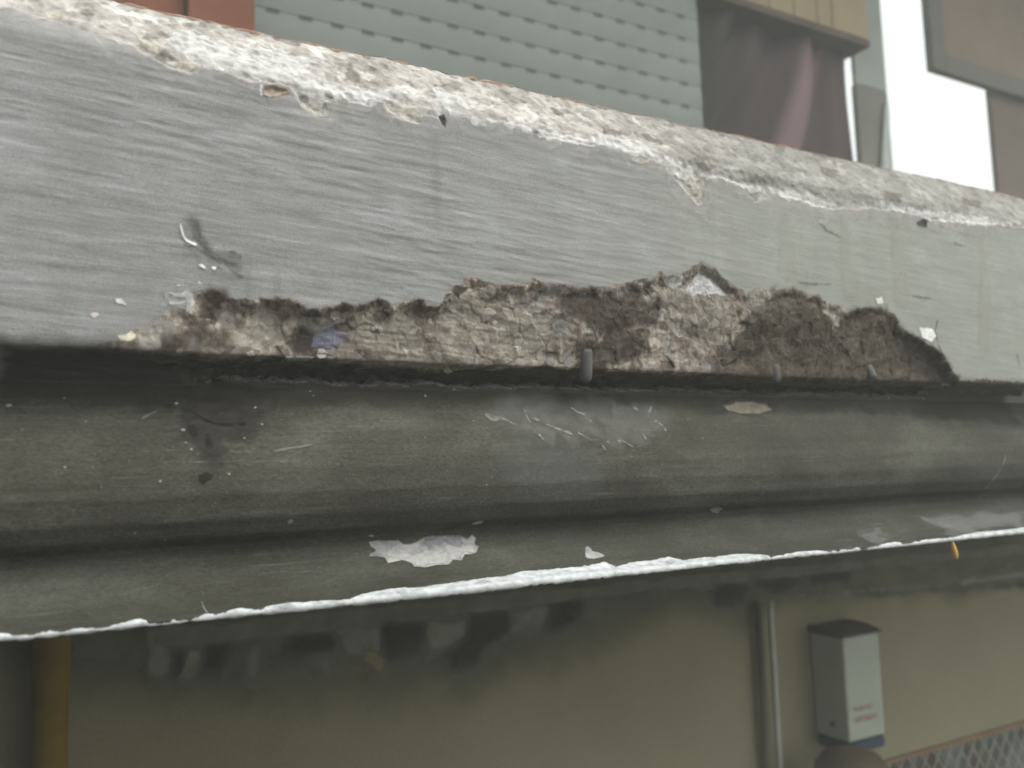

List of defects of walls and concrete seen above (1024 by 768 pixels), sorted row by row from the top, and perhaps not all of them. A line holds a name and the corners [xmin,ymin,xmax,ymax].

spalling [0,0,1024,230]
spalling [98,265,957,399]
water stain [7,640,32,657]
spalling [0,521,1024,641]
water stain [70,534,1024,691]